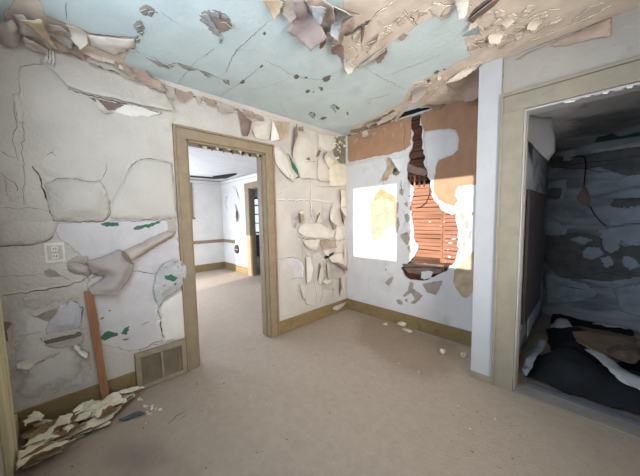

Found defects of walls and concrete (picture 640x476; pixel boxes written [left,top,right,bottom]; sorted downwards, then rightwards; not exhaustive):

crack [146,11,345,94]
crack [0,63,43,205]
peeling [0,0,640,317]
crack [0,269,99,301]
peeling [0,156,187,351]